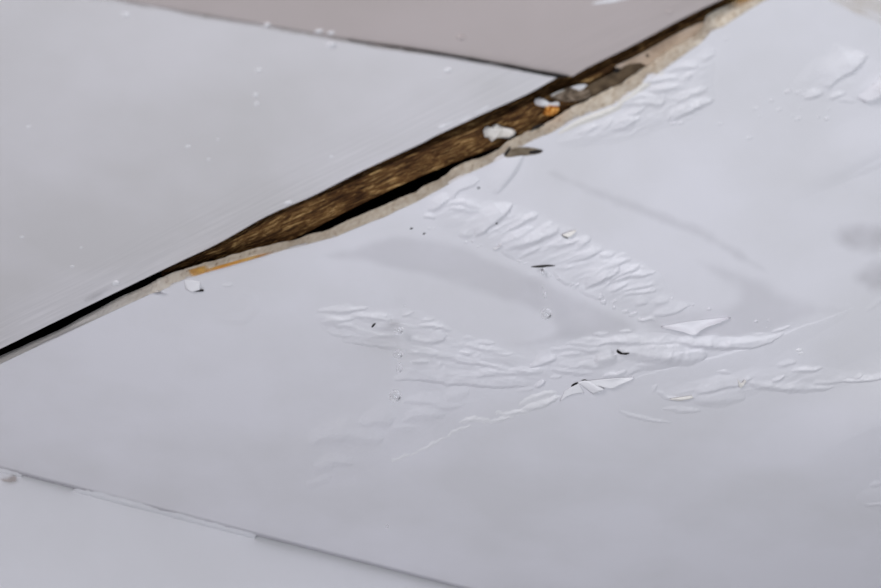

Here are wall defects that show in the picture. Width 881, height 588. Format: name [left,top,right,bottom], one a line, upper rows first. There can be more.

crack [348,40,570,78]
peeling [529,317,792,389]